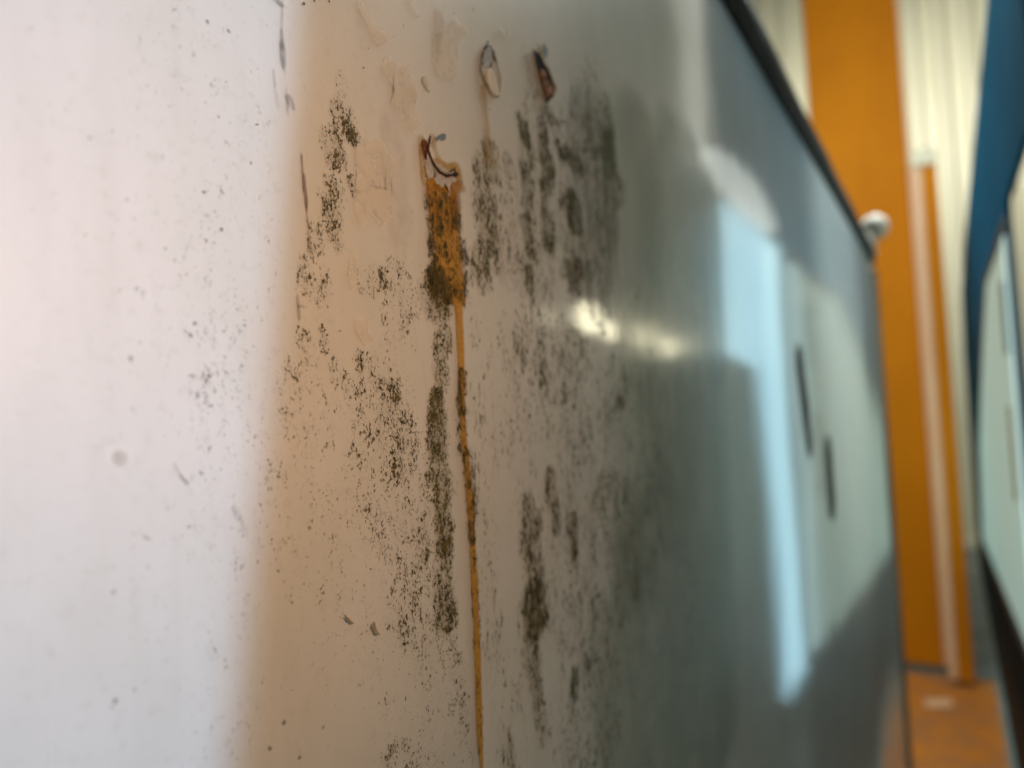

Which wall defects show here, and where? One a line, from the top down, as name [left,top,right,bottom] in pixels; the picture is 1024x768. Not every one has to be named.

water stain [296,70,359,308]
water stain [277,256,472,768]
peeling [421,133,458,196]
corrosion [419,138,483,768]
water stain [464,57,676,768]